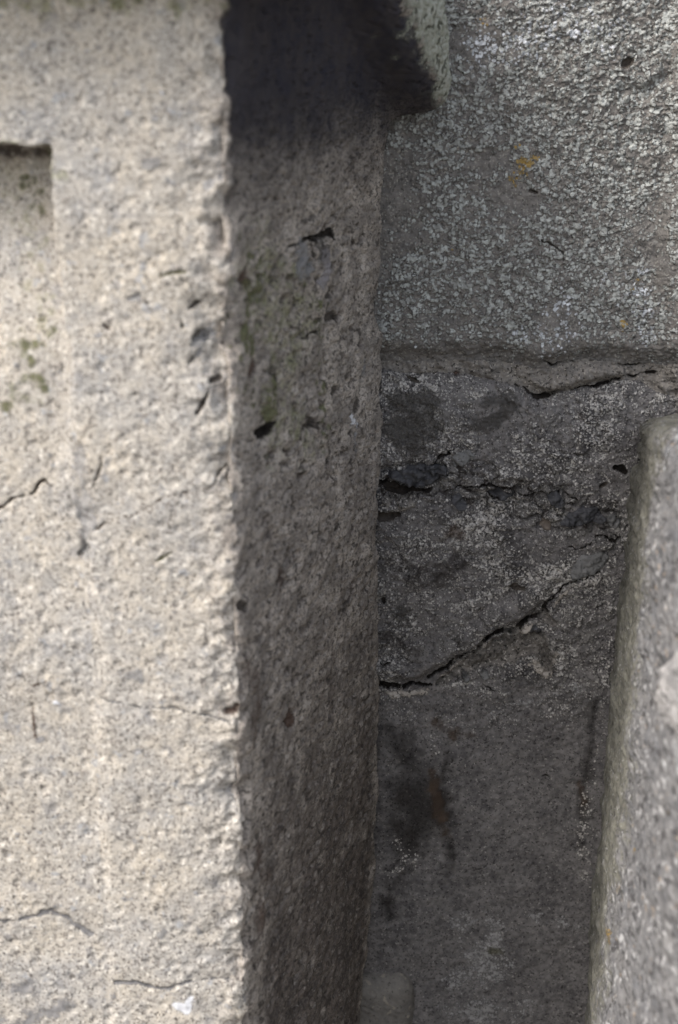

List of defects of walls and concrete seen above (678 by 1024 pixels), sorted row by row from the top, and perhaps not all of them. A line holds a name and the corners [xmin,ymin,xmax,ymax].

crack [475,363,637,400]
crack [428,449,578,500]
crack [567,533,620,550]
crack [379,571,600,690]
leakage [385,779,449,879]
crack [1,905,95,936]